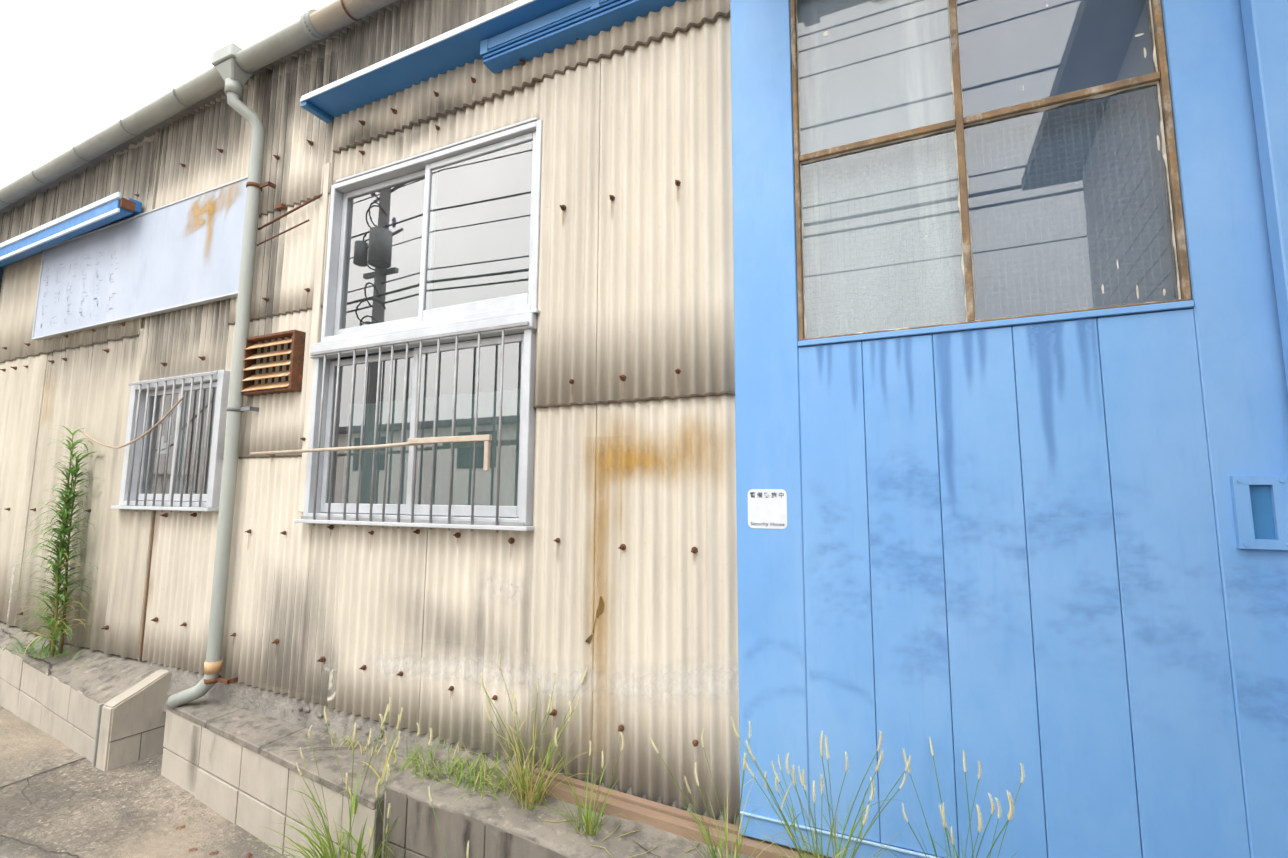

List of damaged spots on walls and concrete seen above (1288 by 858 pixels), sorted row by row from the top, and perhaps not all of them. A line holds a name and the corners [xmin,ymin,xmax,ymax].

corrosion [599,445,678,473]
crack [0,758,85,805]
crack [0,835,80,858]